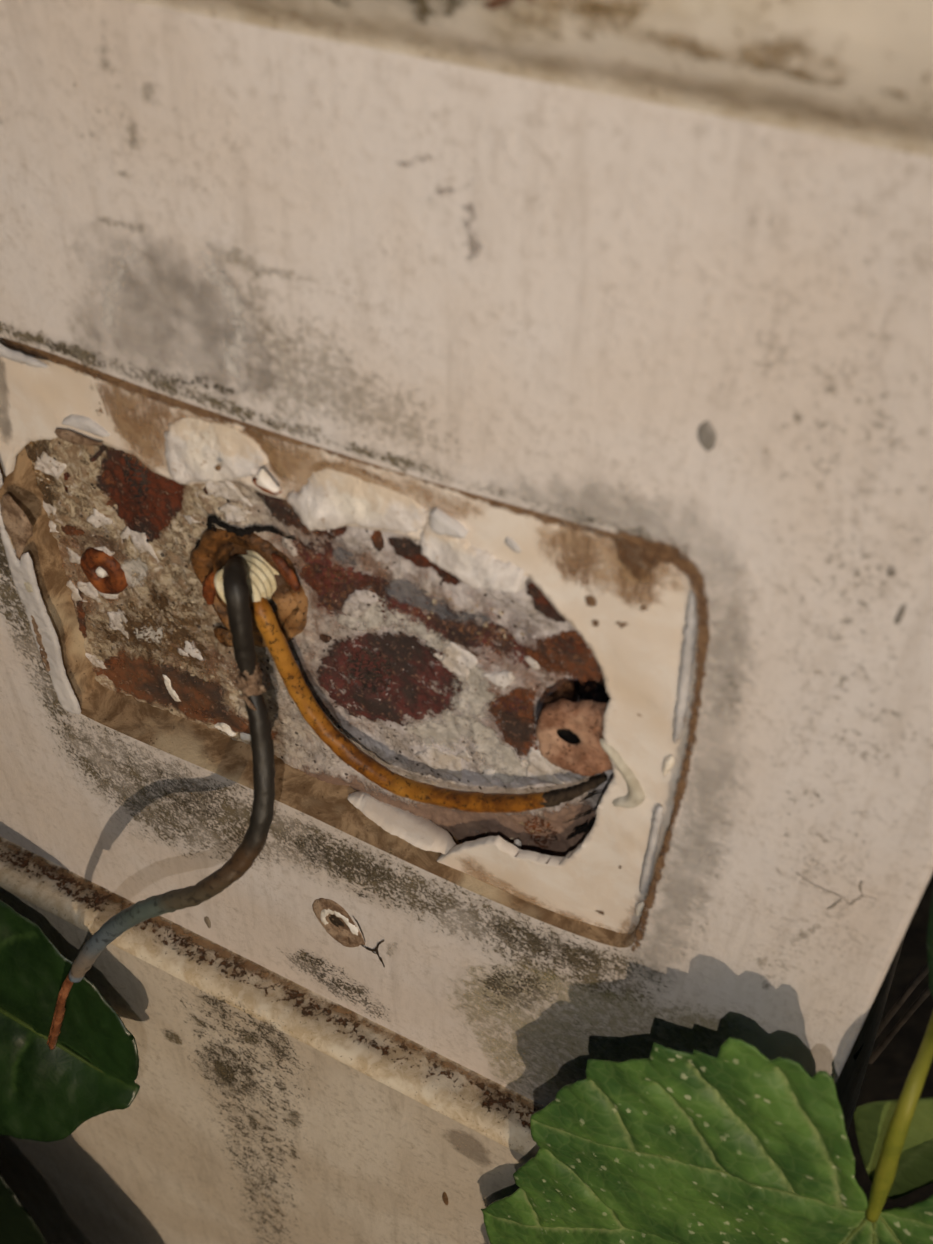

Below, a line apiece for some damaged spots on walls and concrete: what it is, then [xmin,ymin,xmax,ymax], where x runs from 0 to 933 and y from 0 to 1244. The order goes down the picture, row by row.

peeling [54,414,110,446]
rust [90,445,185,543]
peeling [252,468,281,495]
damp [0,252,677,627]
damp [0,533,252,860]
peeling [134,626,163,643]
rust [256,490,604,726]
rust [488,685,546,756]
hole [312,898,365,948]
damp [254,811,667,1006]
damp [164,987,310,1244]
rust [135,916,542,1129]